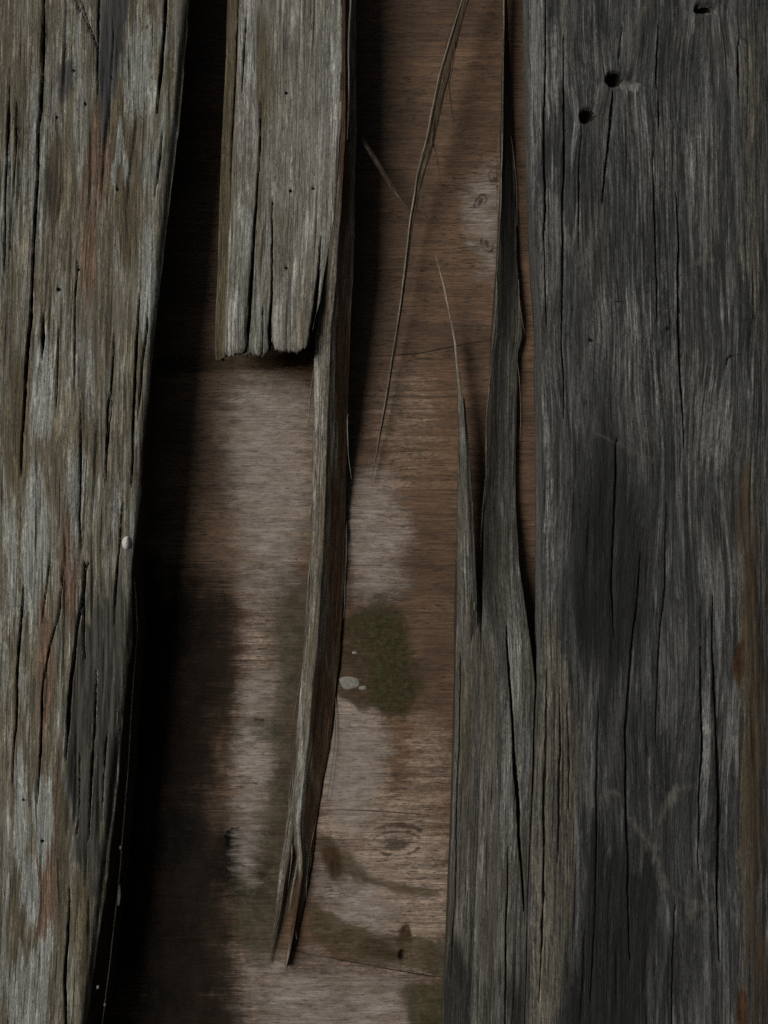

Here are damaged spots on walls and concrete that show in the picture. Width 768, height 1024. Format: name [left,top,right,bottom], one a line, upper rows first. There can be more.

crack [543,0,613,415]
water stain [309,838,445,973]
crack [504,635,570,1024]
crack [697,603,721,940]